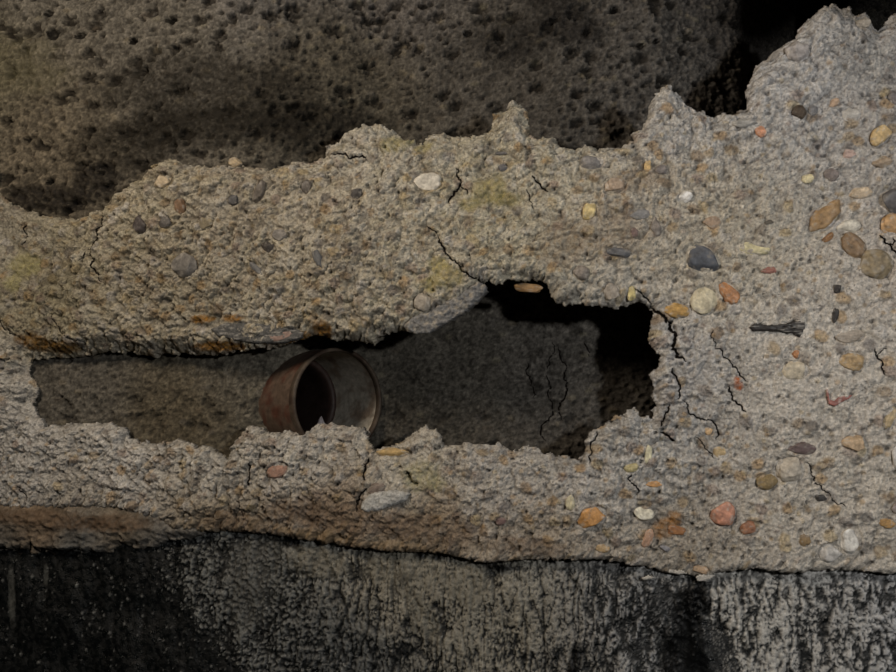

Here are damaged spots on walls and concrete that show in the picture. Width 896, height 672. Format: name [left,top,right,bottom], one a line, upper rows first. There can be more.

water stain [10,59,386,214]
crack [448,168,468,203]
crack [427,226,484,283]
crack [880,235,896,253]
peeling [211,322,305,344]
peeling [404,282,489,334]
crack [525,343,568,441]
crack [630,286,720,458]
crack [710,331,748,412]
peeling [361,490,411,512]